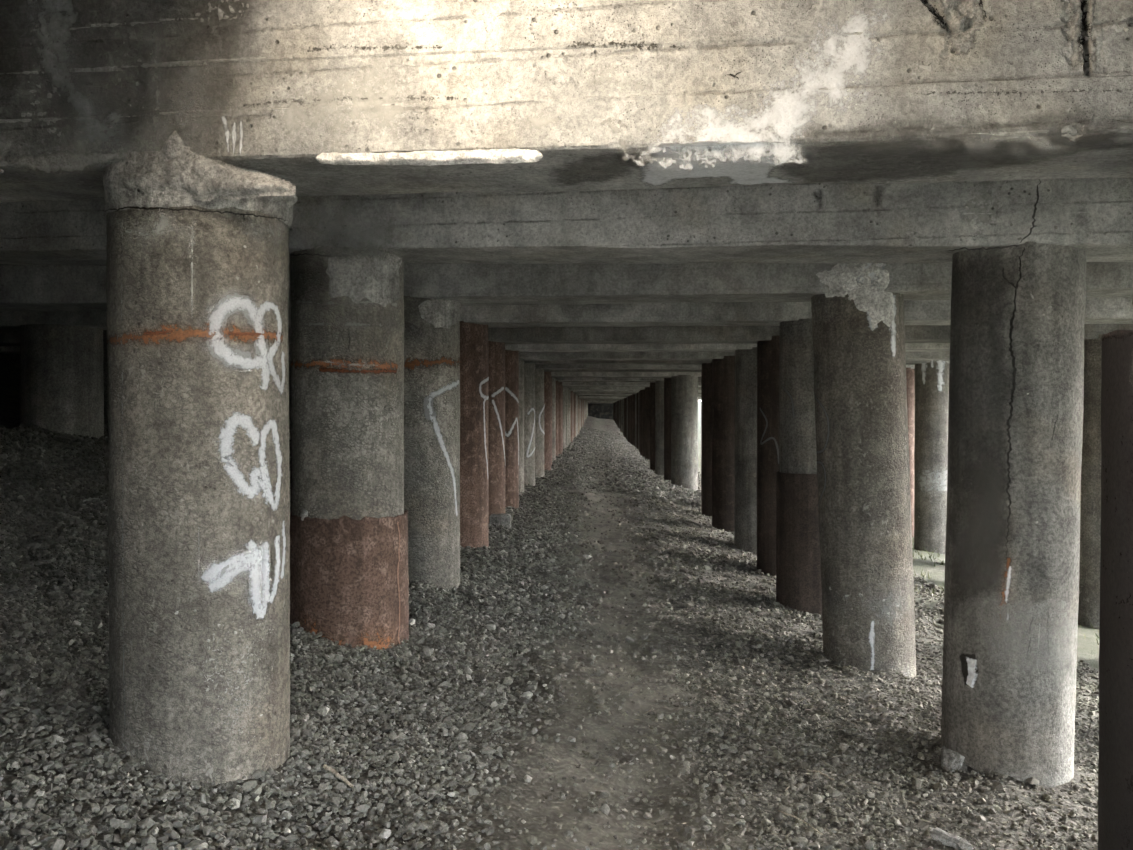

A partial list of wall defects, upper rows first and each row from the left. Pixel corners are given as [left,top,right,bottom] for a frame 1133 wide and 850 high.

crack [921,0,987,55]
crack [1065,0,1097,76]
leakage [554,9,1129,207]
crack [948,180,1058,251]